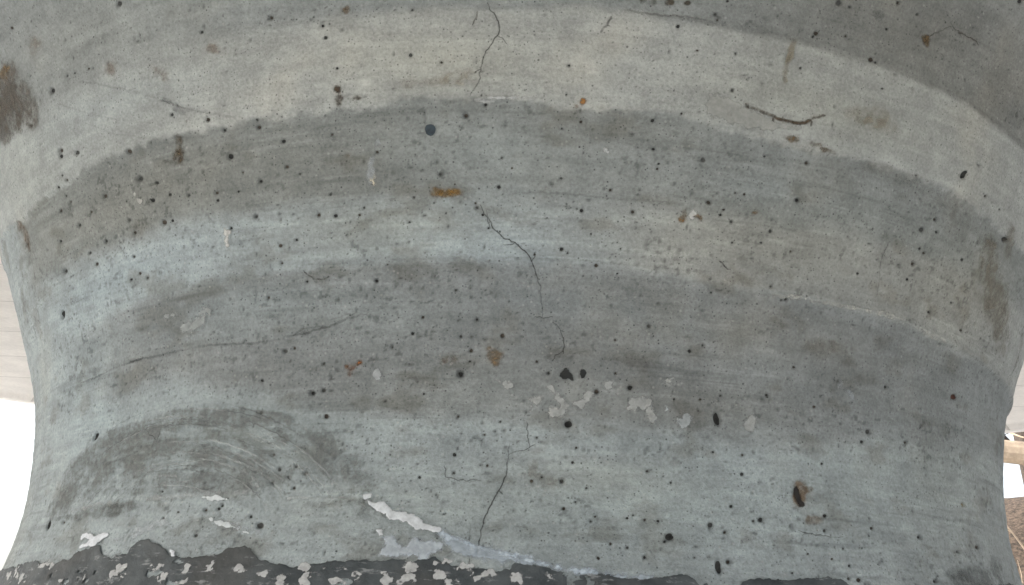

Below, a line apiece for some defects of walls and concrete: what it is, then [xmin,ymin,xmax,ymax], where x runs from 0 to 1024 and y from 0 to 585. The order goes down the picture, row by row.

crack [472,3,507,71]
leakage [0,66,38,142]
crack [753,108,825,126]
corrosion [431,188,460,197]
crack [481,207,541,286]
spalling [529,368,594,417]
spalling [627,397,691,429]
crack [469,423,533,562]
peeling [0,493,708,585]
peeling [741,576,848,585]